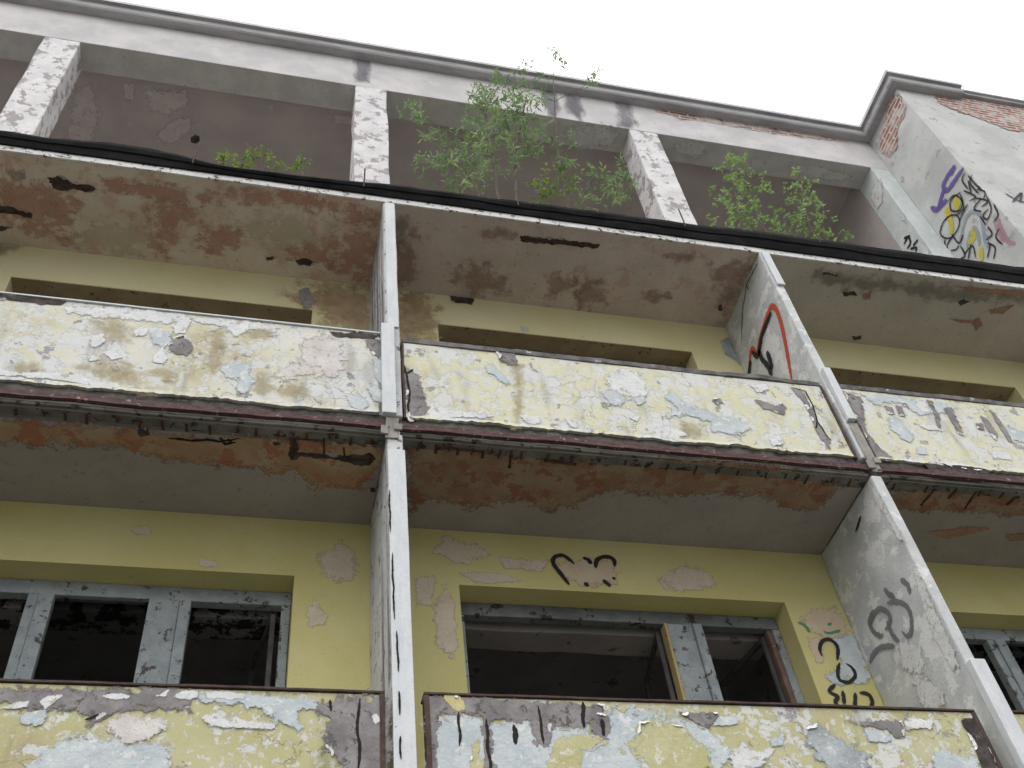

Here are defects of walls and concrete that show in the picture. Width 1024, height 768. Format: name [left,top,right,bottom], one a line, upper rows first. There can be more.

flaking render [879,94,906,157]
flaking render [934,95,1024,132]
spalling [47,175,96,193]
spalling [520,236,600,249]
peeling [0,293,280,364]
spalling [0,331,386,421]
peeling [400,359,861,517]
peeling [842,391,1024,541]
spalling [0,684,394,768]
peeling [421,695,784,768]
peeling [799,638,945,768]
spalling [931,717,997,768]